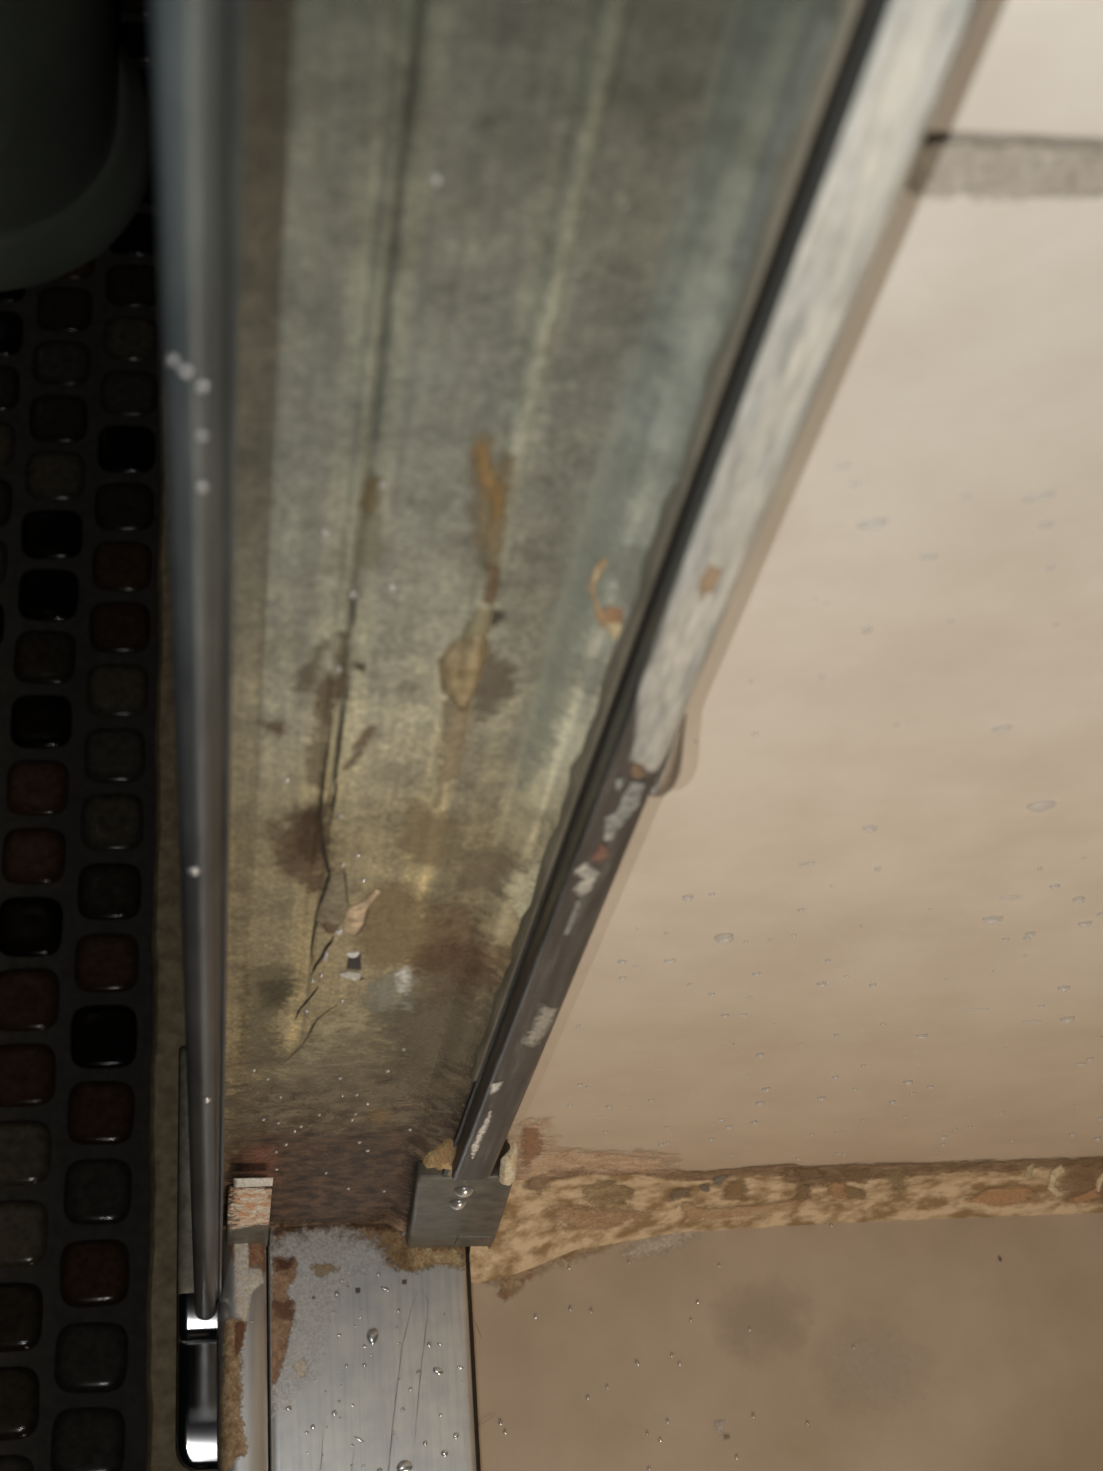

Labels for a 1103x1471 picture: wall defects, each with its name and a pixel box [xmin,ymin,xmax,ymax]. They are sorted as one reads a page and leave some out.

rust [469,435,514,605]
crack [349,598,357,629]
rust [587,556,624,640]
crack [281,683,349,1066]
damp [223,882,512,1227]
peeling [499,1143,517,1186]
peeling [1025,1164,1066,1197]